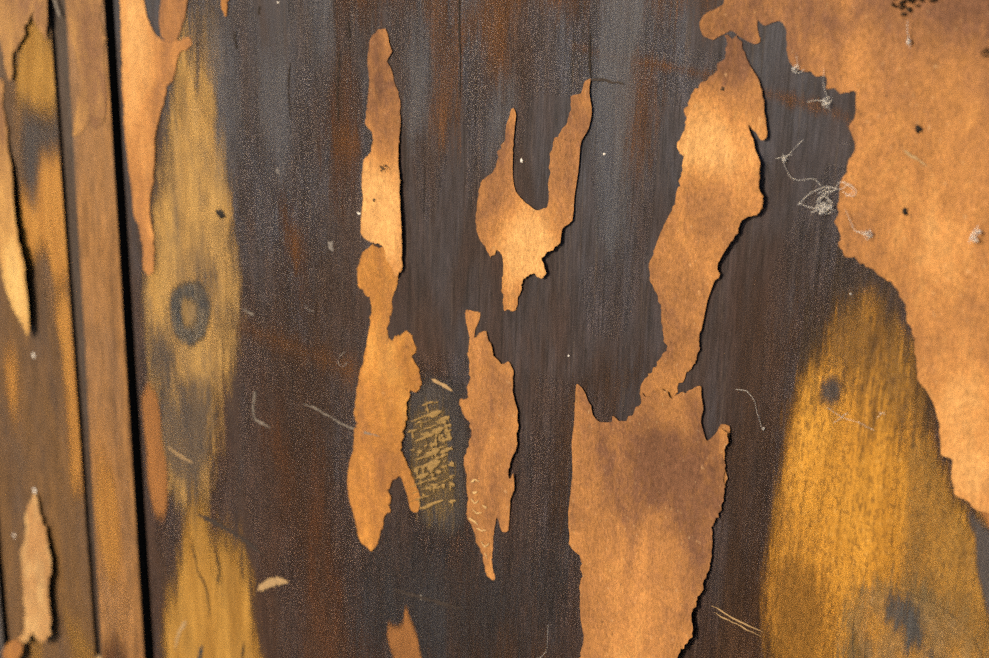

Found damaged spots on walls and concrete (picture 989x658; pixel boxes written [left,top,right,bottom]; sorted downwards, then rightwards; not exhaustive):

peeling [15,17,56,124]
water stain [149,329,213,514]
peeling [718,429,729,484]
water stain [822,381,839,403]
water stain [971,516,989,610]